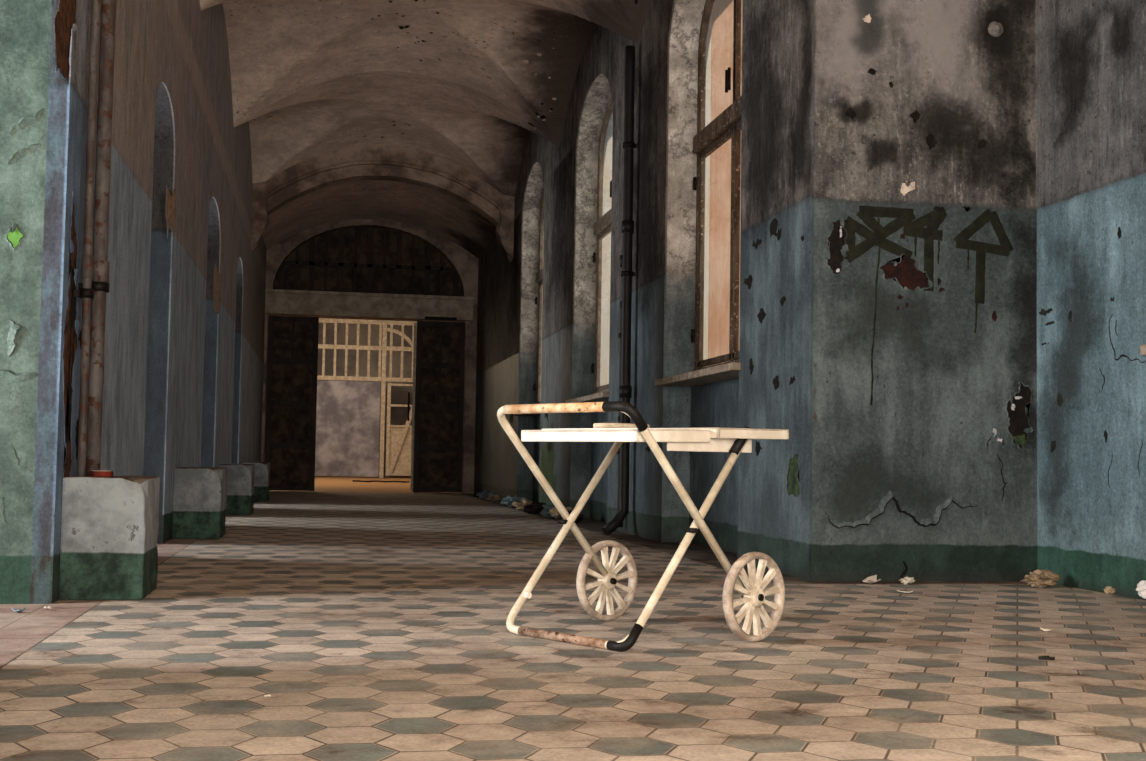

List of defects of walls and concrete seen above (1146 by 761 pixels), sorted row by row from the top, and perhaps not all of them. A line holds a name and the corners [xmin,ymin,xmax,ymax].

leakage [855,0,881,52]
leakage [839,101,870,122]
leakage [868,140,895,168]
leakage [917,98,1030,183]
spalling [993,381,1033,450]